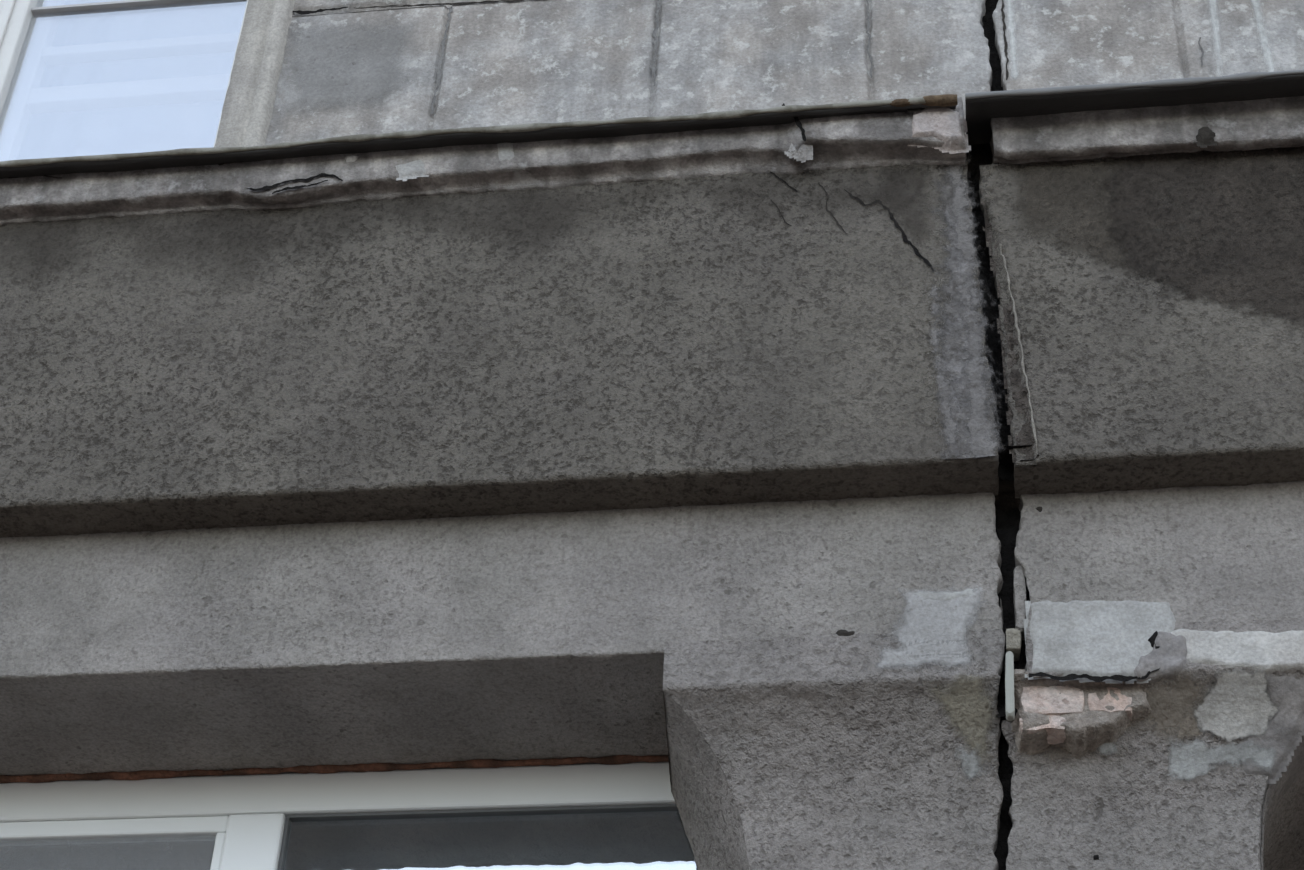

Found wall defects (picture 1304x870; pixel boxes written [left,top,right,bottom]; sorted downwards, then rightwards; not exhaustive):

crack [982,0,1009,91]
spalling [782,103,813,163]
crack [770,172,934,272]
damp [1017,146,1304,324]
crack [966,143,1032,870]
peeling [878,588,982,668]
spalling [1011,629,1304,784]